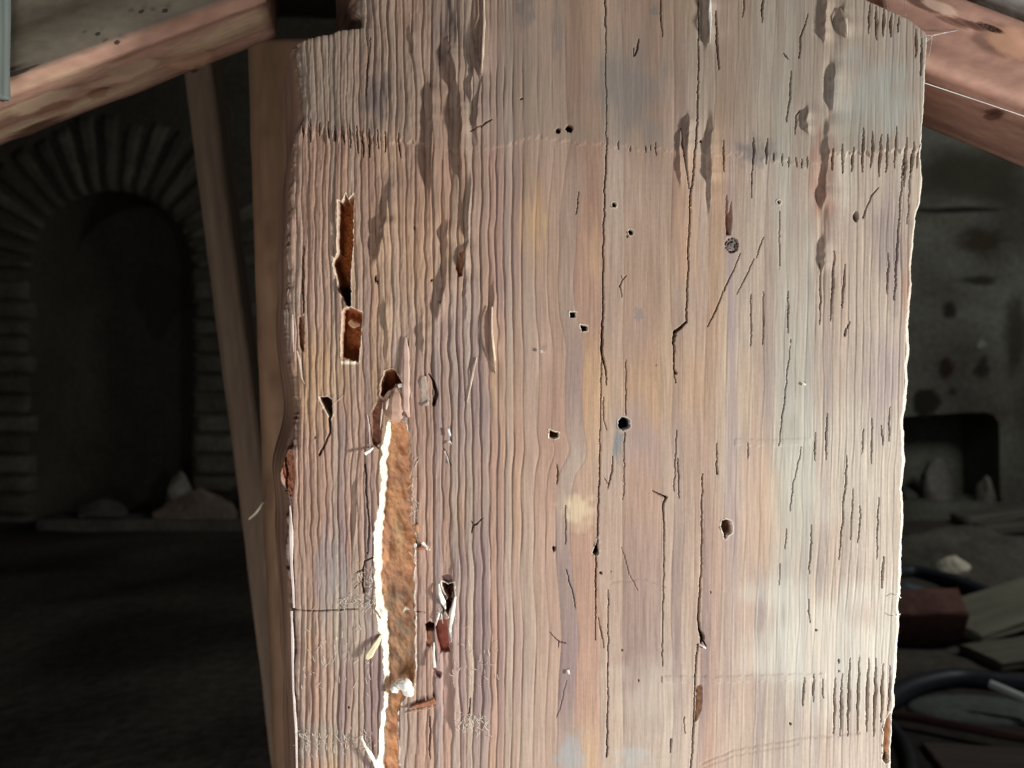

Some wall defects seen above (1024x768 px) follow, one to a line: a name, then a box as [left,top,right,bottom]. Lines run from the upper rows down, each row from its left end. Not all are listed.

crack [556,0,718,768]
crack [672,0,891,623]